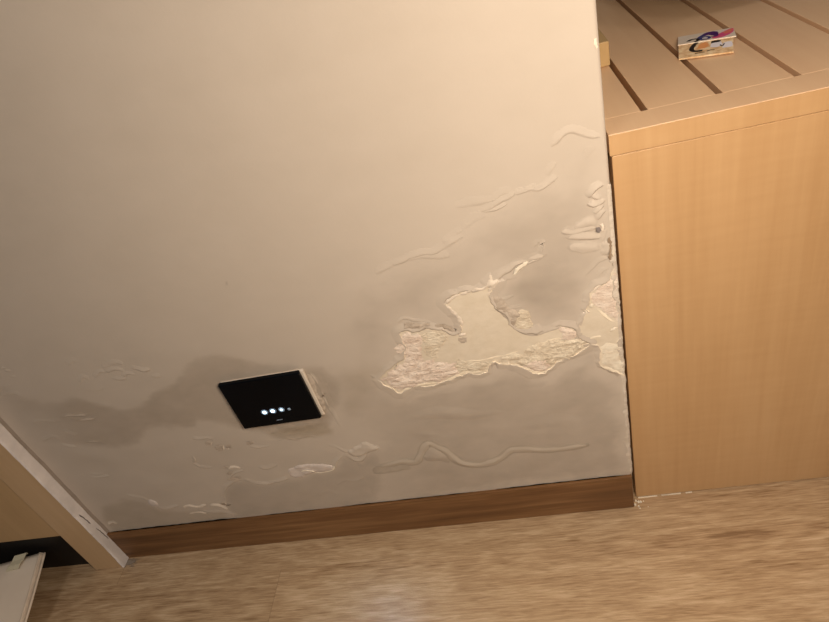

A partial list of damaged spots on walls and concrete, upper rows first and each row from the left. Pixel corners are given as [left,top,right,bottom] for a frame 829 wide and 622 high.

peeling [370,182,632,473]